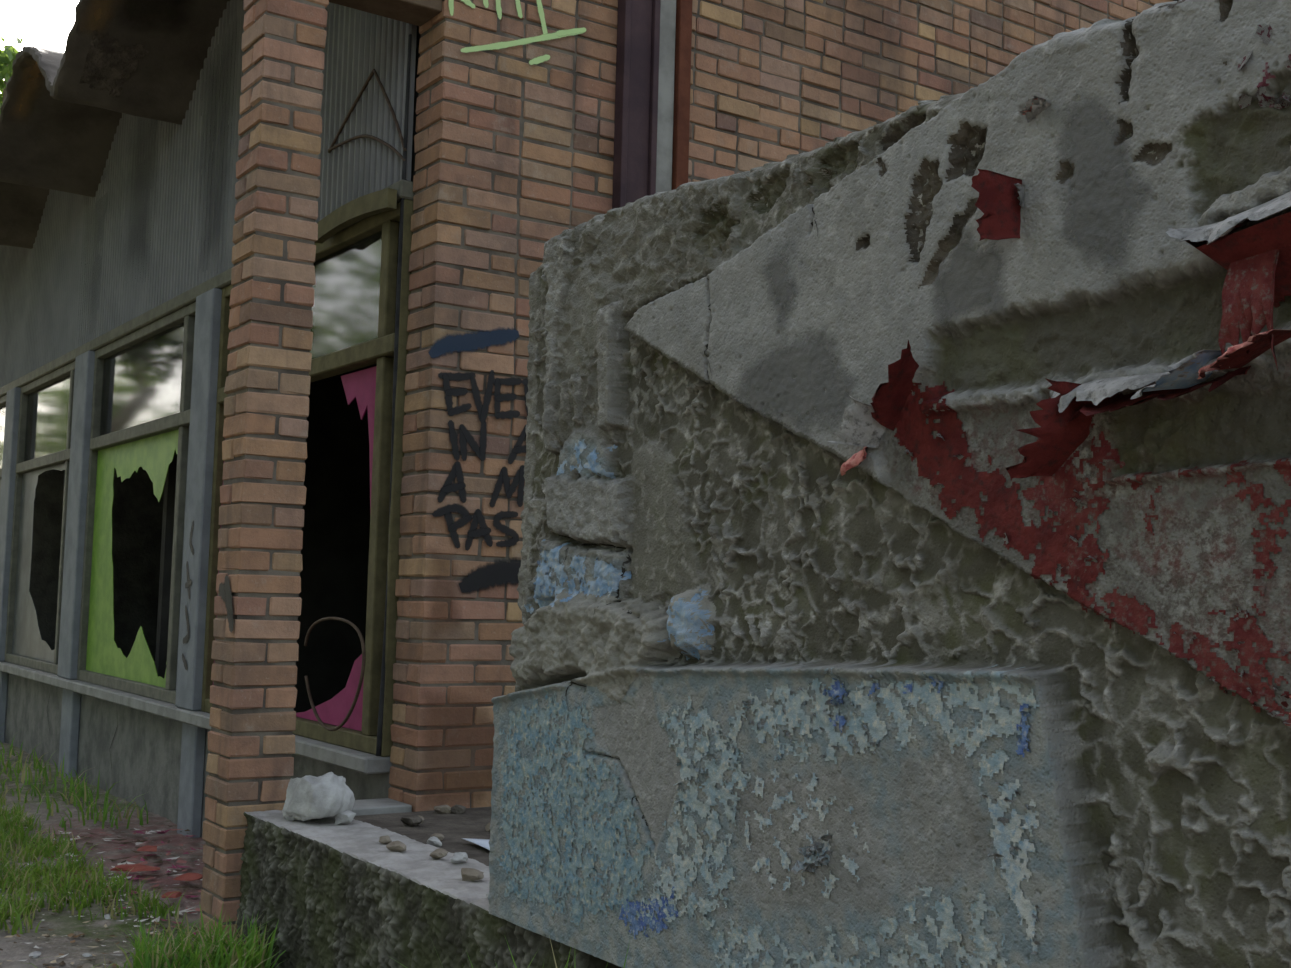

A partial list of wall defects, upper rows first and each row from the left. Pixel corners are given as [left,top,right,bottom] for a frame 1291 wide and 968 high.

peeling [904,121,1025,289]
spalling [1055,161,1075,184]
peeling [827,191,1291,728]
crack [559,535,640,618]
peeling [496,665,1040,968]